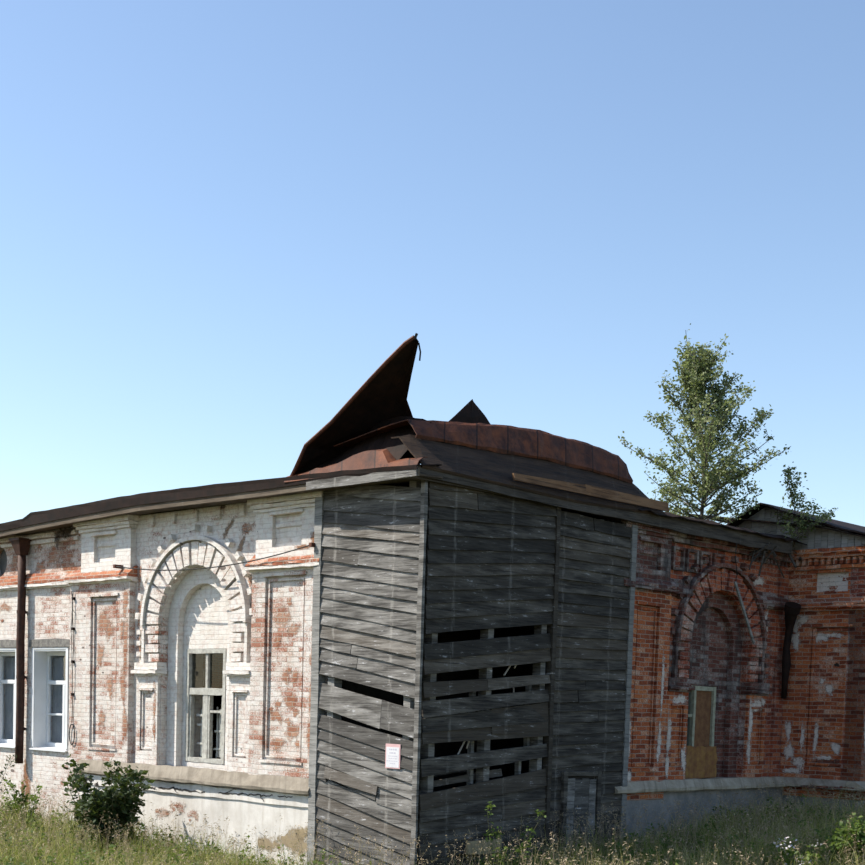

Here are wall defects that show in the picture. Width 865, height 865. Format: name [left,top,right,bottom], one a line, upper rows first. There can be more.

peeling [36,541,76,573]
peeling [97,567,142,742]
peeling [275,597,300,649]
peeling [269,668,311,756]